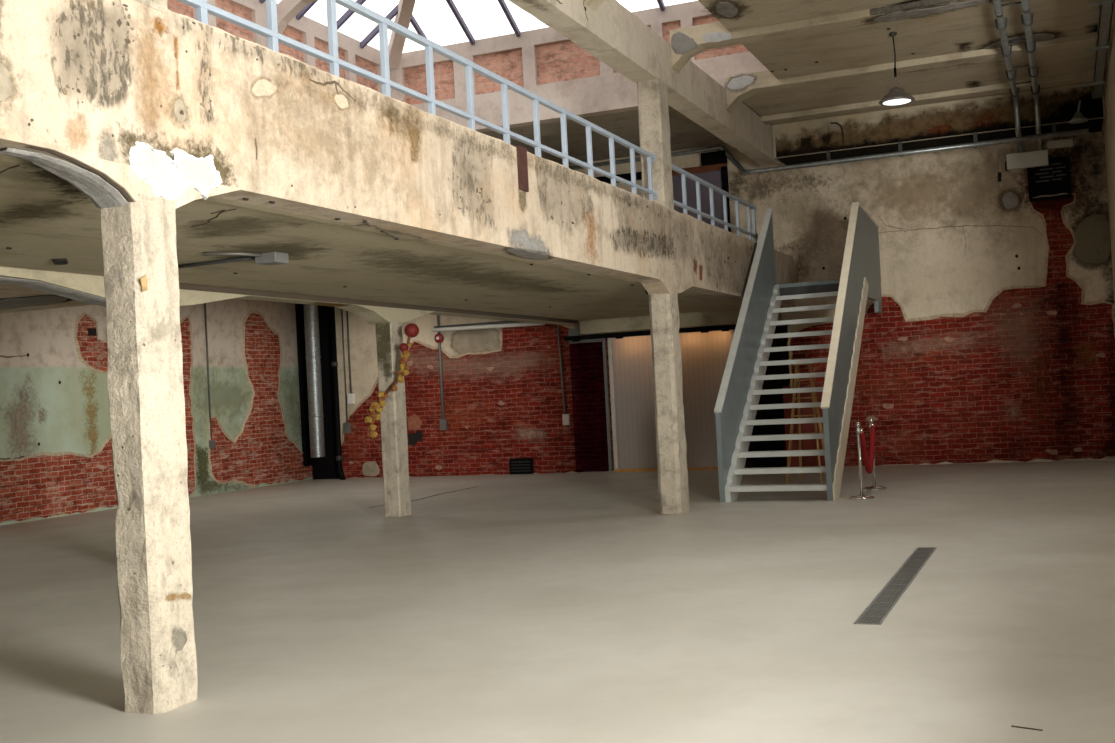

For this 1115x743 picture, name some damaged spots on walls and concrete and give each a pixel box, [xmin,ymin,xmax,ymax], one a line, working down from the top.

leakage [775,86,1110,233]
crack [345,219,429,241]
flaking render [0,390,117,523]
flaking render [74,312,108,374]
flaking render [180,310,313,496]
flaking render [341,377,383,478]
flaking render [404,324,614,477]
flaking render [787,321,834,388]
flaking render [844,193,1115,466]